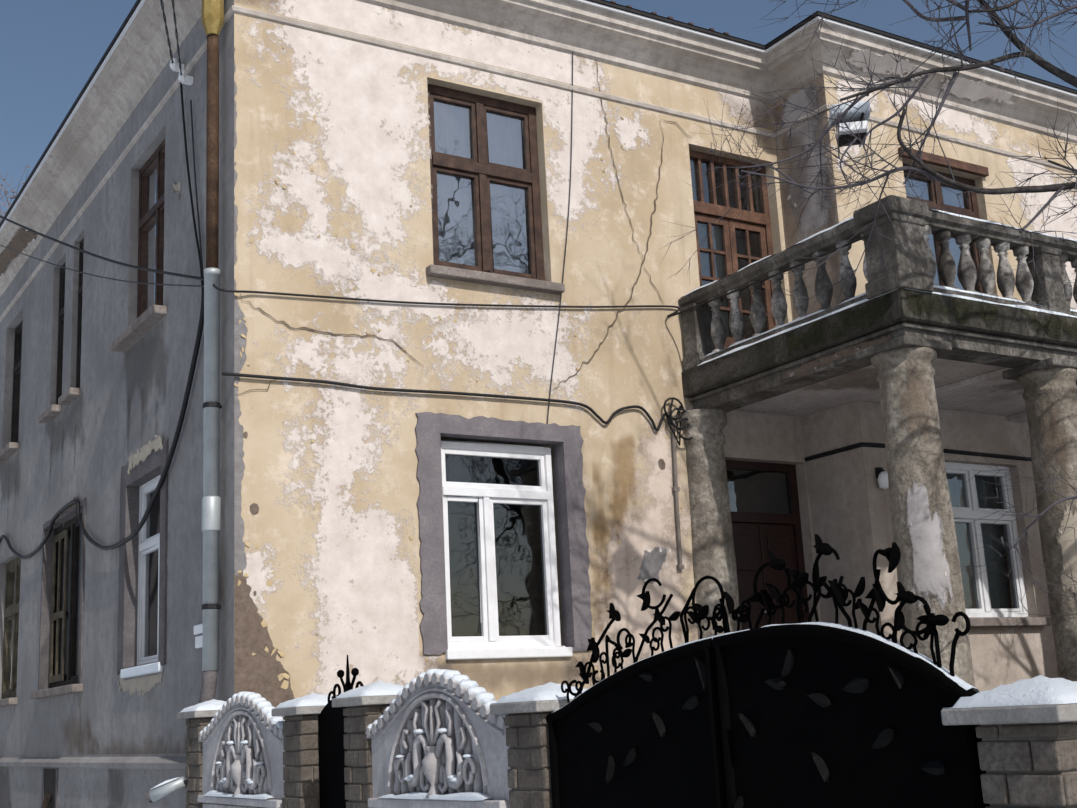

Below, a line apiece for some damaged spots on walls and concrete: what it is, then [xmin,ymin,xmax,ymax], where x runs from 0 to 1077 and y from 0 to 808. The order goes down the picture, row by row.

crack [240,294,424,366]
peeling [234,0,650,717]
crack [552,61,691,390]
peeling [907,482,953,613]